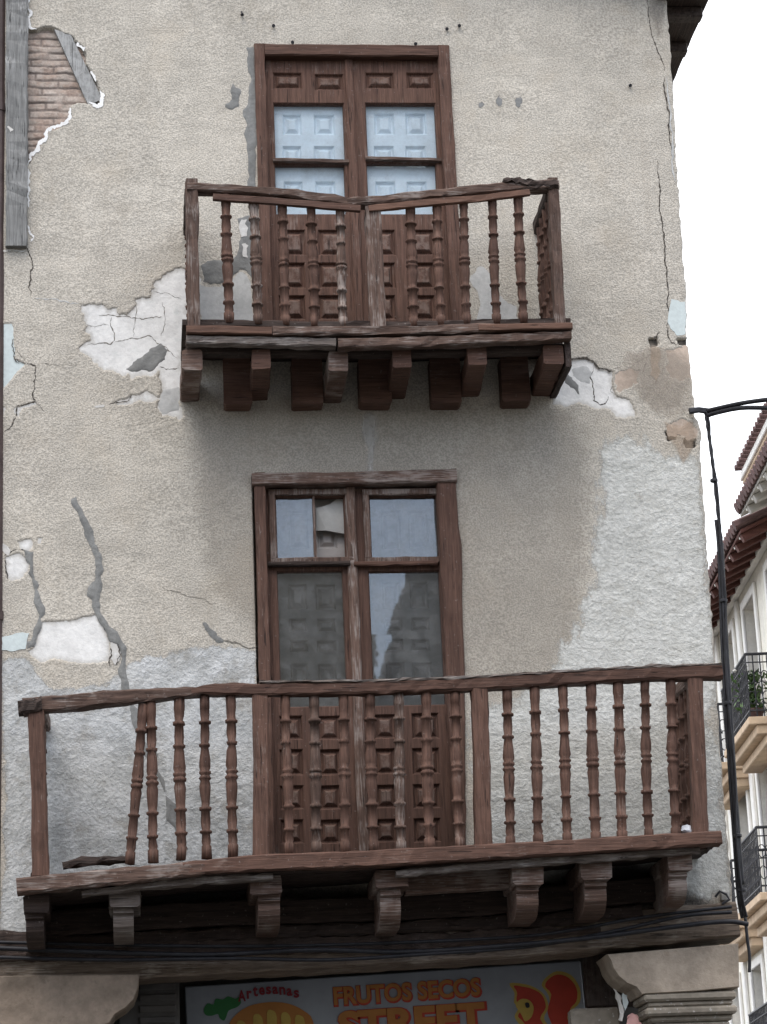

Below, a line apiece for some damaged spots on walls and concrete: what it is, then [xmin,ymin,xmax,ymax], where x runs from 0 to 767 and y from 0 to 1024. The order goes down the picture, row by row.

flaking render [27,0,105,175]
crack [571,0,683,372]
crack [4,340,78,432]
peeling [79,268,187,420]
peeling [553,359,635,418]
spalling [665,419,698,448]
peeling [3,538,42,581]
peeling [2,615,121,666]